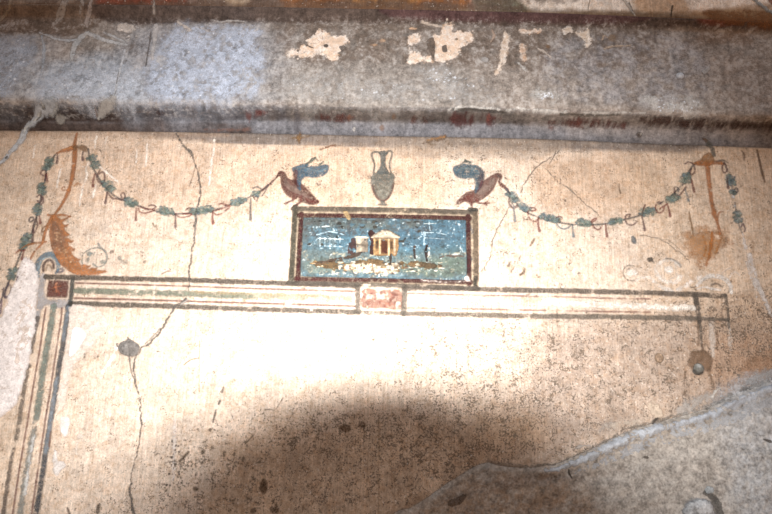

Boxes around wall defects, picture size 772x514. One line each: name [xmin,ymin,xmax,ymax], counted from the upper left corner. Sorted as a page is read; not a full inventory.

peeling [287,28,350,61]
peeling [406,19,474,65]
crack [129,134,201,514]